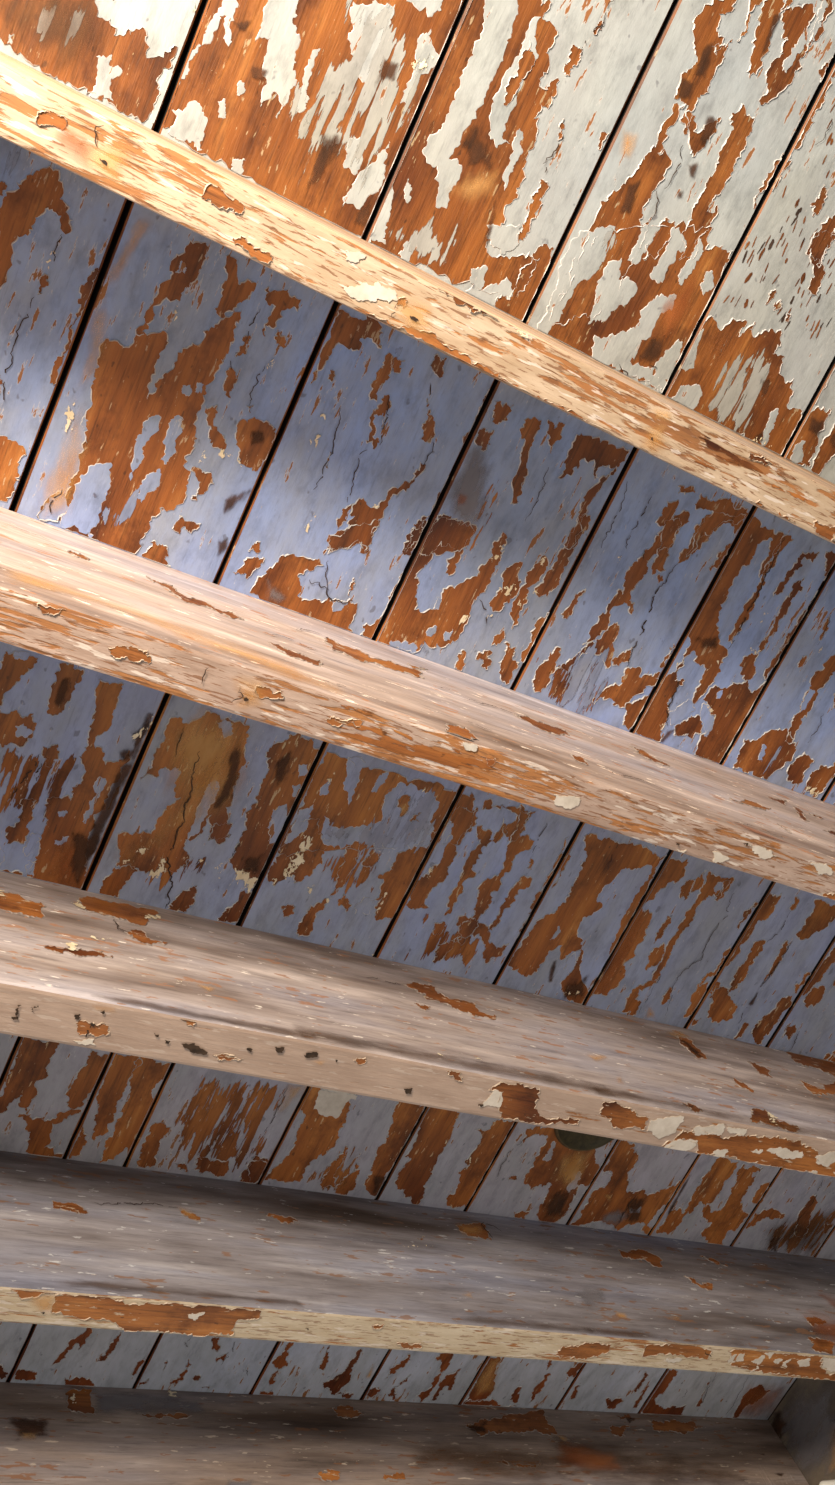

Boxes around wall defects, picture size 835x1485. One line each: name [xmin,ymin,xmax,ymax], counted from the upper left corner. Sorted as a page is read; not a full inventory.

peeling [0,0,835,502]
peeling [10,235,301,621]
peeling [108,645,152,663]
peeling [233,281,835,859]
peeling [0,651,735,1020]
peeling [0,1019,460,1205]
peeling [446,862,835,1291]
peeling [52,1200,201,1223]
peeling [0,1289,261,1420]
peeling [259,1342,294,1396]
peeling [319,1341,611,1437]
peeling [605,1343,835,1437]